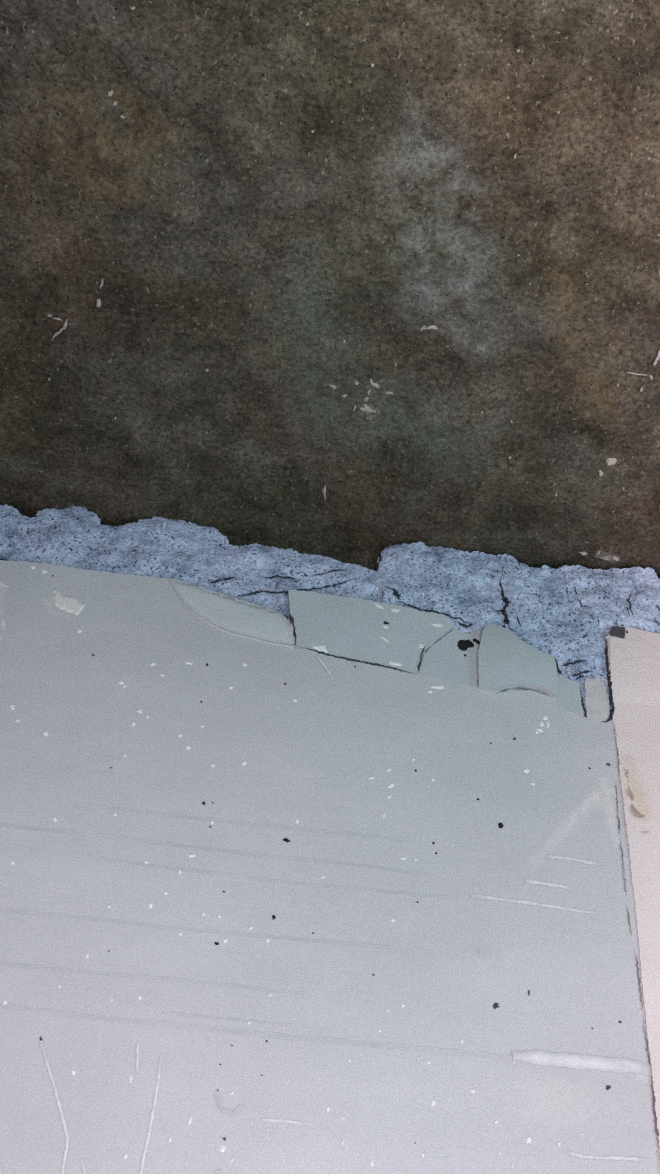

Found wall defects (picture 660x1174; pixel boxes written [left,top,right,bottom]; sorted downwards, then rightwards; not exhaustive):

leakage [231,56,544,488]
peeling [329,381,376,413]
spalling [0,504,660,723]